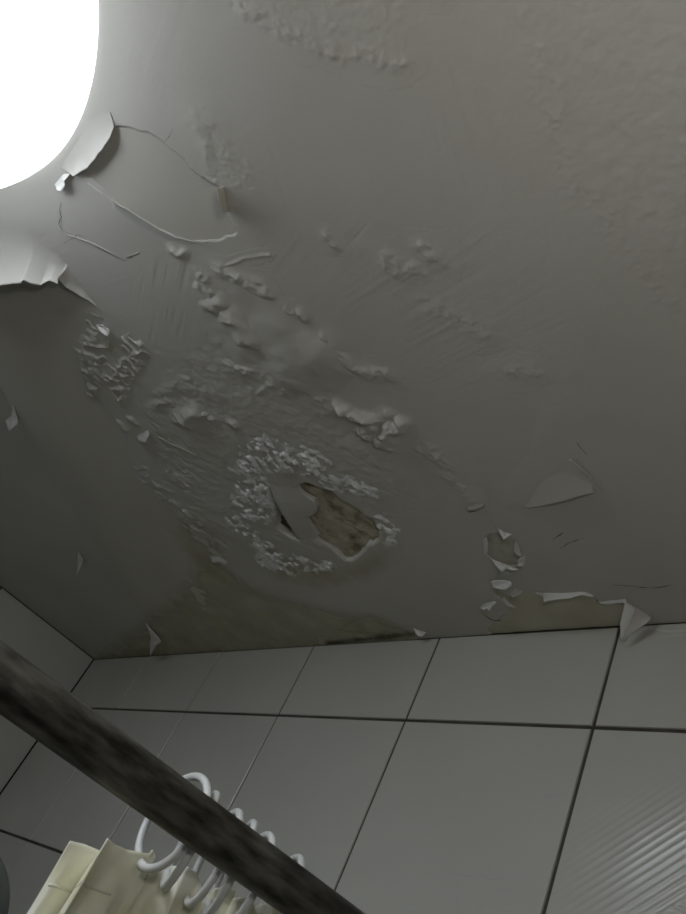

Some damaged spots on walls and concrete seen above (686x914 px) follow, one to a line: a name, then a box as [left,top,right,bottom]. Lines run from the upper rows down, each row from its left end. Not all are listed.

crack [59,206,139,261]
peeling [55,112,236,245]
peeling [0,228,426,656]
water stain [128,568,408,655]
water stain [219,433,379,578]
water stain [373,514,401,547]
peeling [480,527,652,642]